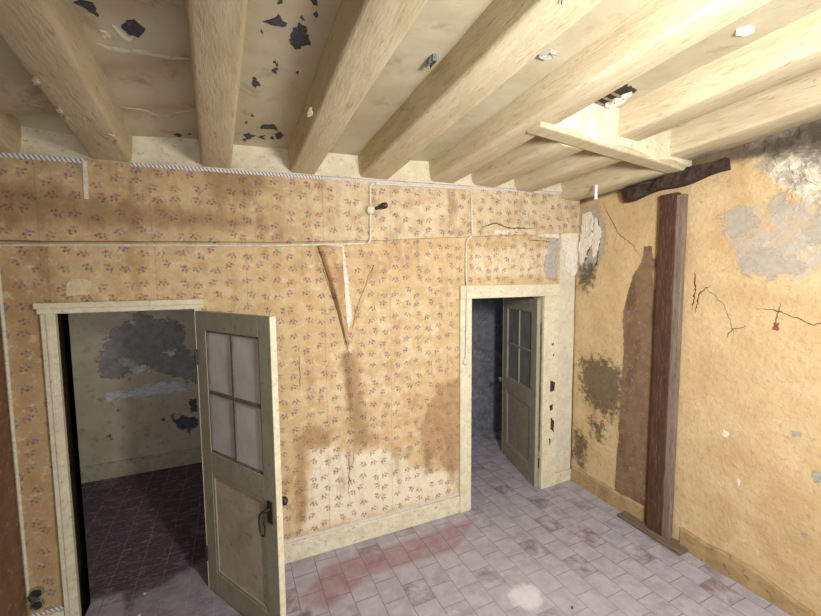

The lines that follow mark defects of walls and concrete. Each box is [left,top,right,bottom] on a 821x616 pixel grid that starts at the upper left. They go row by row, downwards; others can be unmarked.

peeling [74,0,99,17]
peeling [100,19,145,42]
peeling [261,0,318,50]
peeling [243,115,284,142]
flaking render [718,204,808,282]
peeling [316,245,374,353]
crack [692,272,745,338]
crack [766,304,821,331]
peeling [97,311,198,433]
water stain [572,354,622,469]